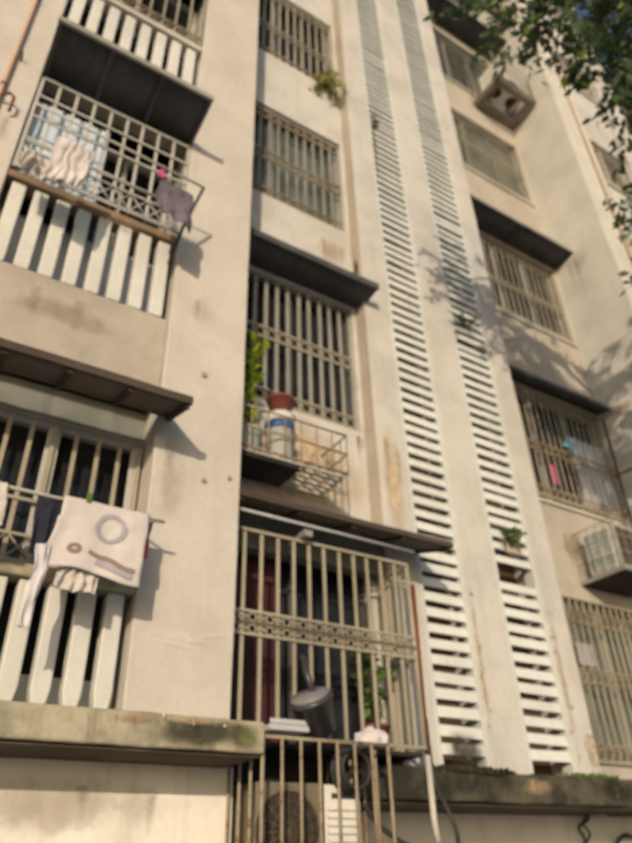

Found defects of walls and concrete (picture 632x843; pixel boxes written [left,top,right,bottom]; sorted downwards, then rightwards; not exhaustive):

leakage [168,720,244,743]